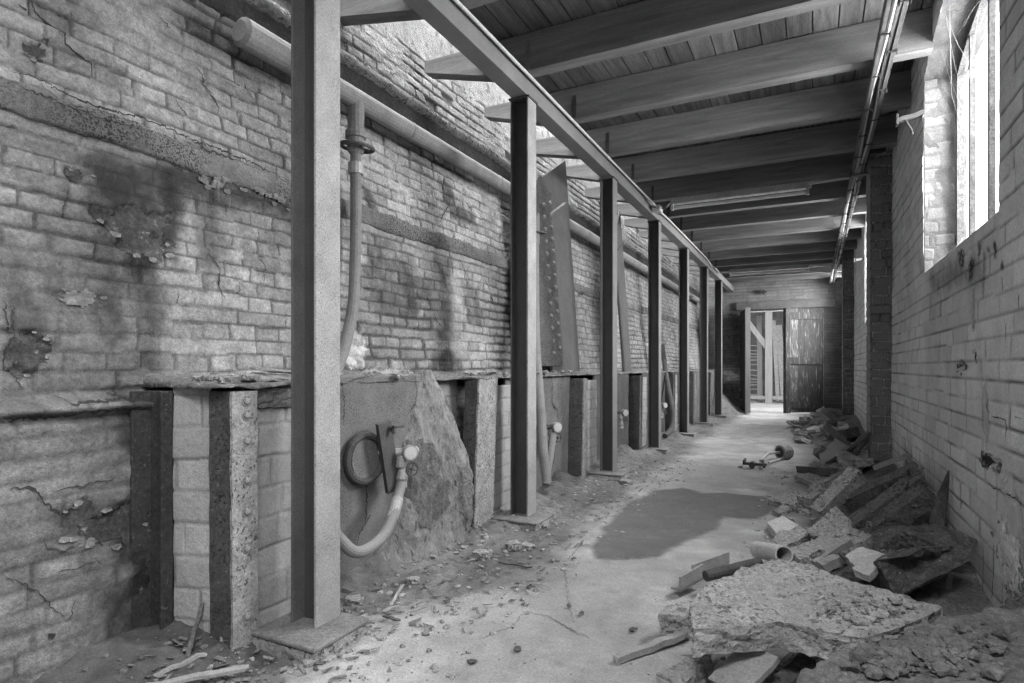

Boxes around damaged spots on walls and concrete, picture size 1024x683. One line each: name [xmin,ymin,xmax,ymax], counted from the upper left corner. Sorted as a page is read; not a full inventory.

crack [9,69,291,181]
spalling [64,165,96,184]
spalling [89,204,177,263]
leakage [87,157,291,259]
peeling [198,175,291,212]
peeling [59,288,108,308]
leakage [127,253,156,320]
spalling [3,331,52,379]
spalling [978,450,1002,473]
crack [13,477,117,516]
spalling [58,498,129,550]
crack [0,539,94,618]